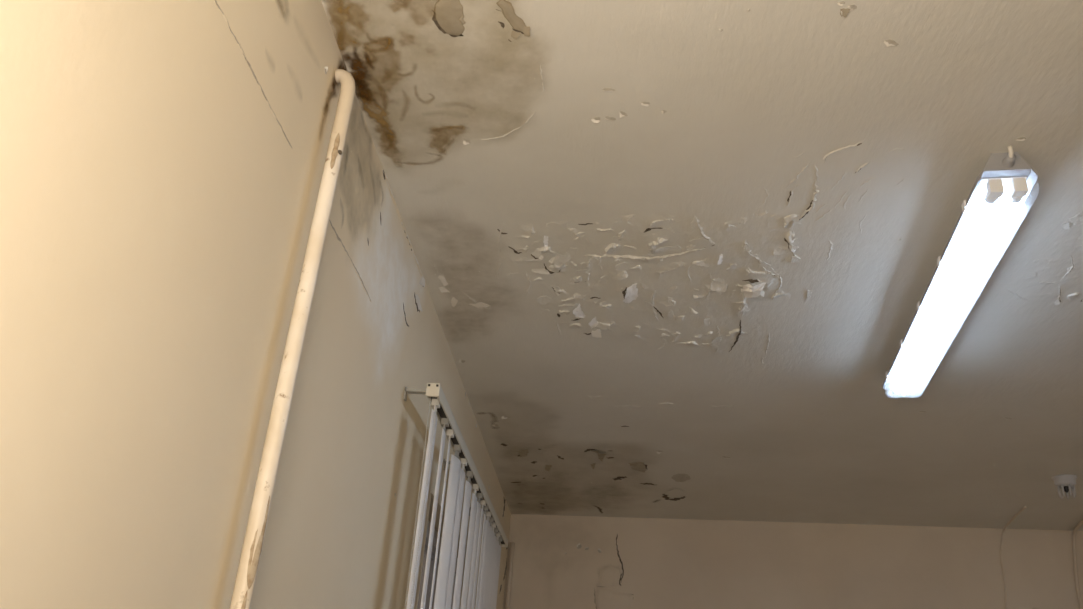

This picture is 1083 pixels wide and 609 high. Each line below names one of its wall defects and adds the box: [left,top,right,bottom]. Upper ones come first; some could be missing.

damp [333,0,392,62]
damp [351,65,397,153]
peeling [495,141,878,364]
peeling [1004,203,1083,306]
crack [594,535,633,609]